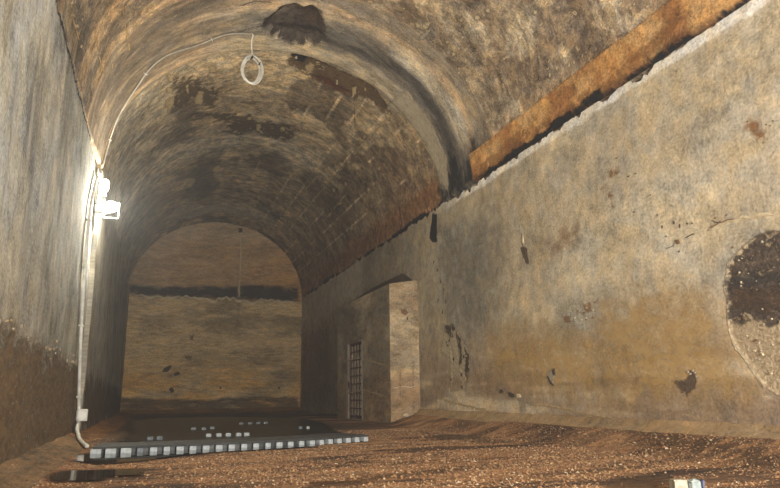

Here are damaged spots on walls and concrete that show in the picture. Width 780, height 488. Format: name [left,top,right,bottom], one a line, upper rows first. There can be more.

damp [718,0,751,22]
damp [129,32,701,301]
flaking render [519,225,529,264]
flaking render [724,230,780,396]
damp [0,319,298,465]
flaking render [441,324,471,391]
flaking render [674,369,698,395]